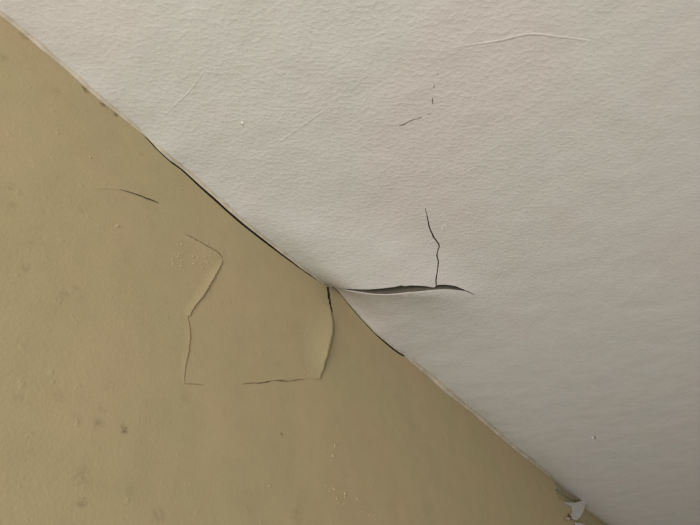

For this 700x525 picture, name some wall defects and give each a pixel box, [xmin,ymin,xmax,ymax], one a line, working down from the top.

crack [94,186,157,203]
crack [145,137,404,356]
crack [425,208,440,285]
peeling [303,295,334,380]
spalling [553,481,605,525]